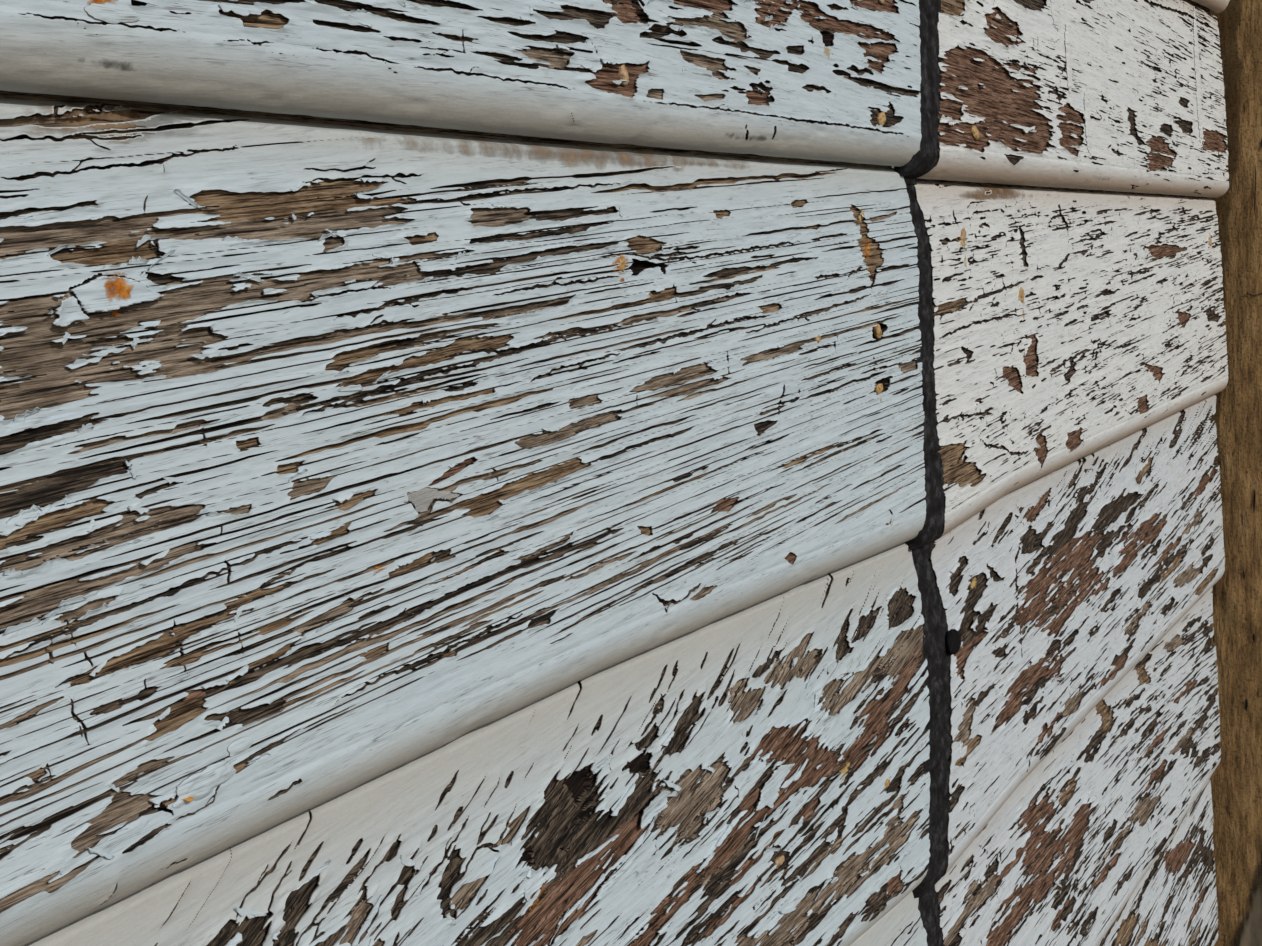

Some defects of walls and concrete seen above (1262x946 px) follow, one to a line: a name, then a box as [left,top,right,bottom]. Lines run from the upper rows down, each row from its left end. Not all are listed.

crack [0,107,323,193]
crack [303,159,844,218]
crack [316,0,917,137]
crack [956,1,983,27]
peeling [938,7,1085,165]
corrosion [105,273,133,316]
peeling [142,595,362,741]
crack [0,185,1227,946]
peeling [993,486,1167,728]
peeling [629,585,923,946]
peeling [206,836,422,946]
peeling [437,758,729,946]